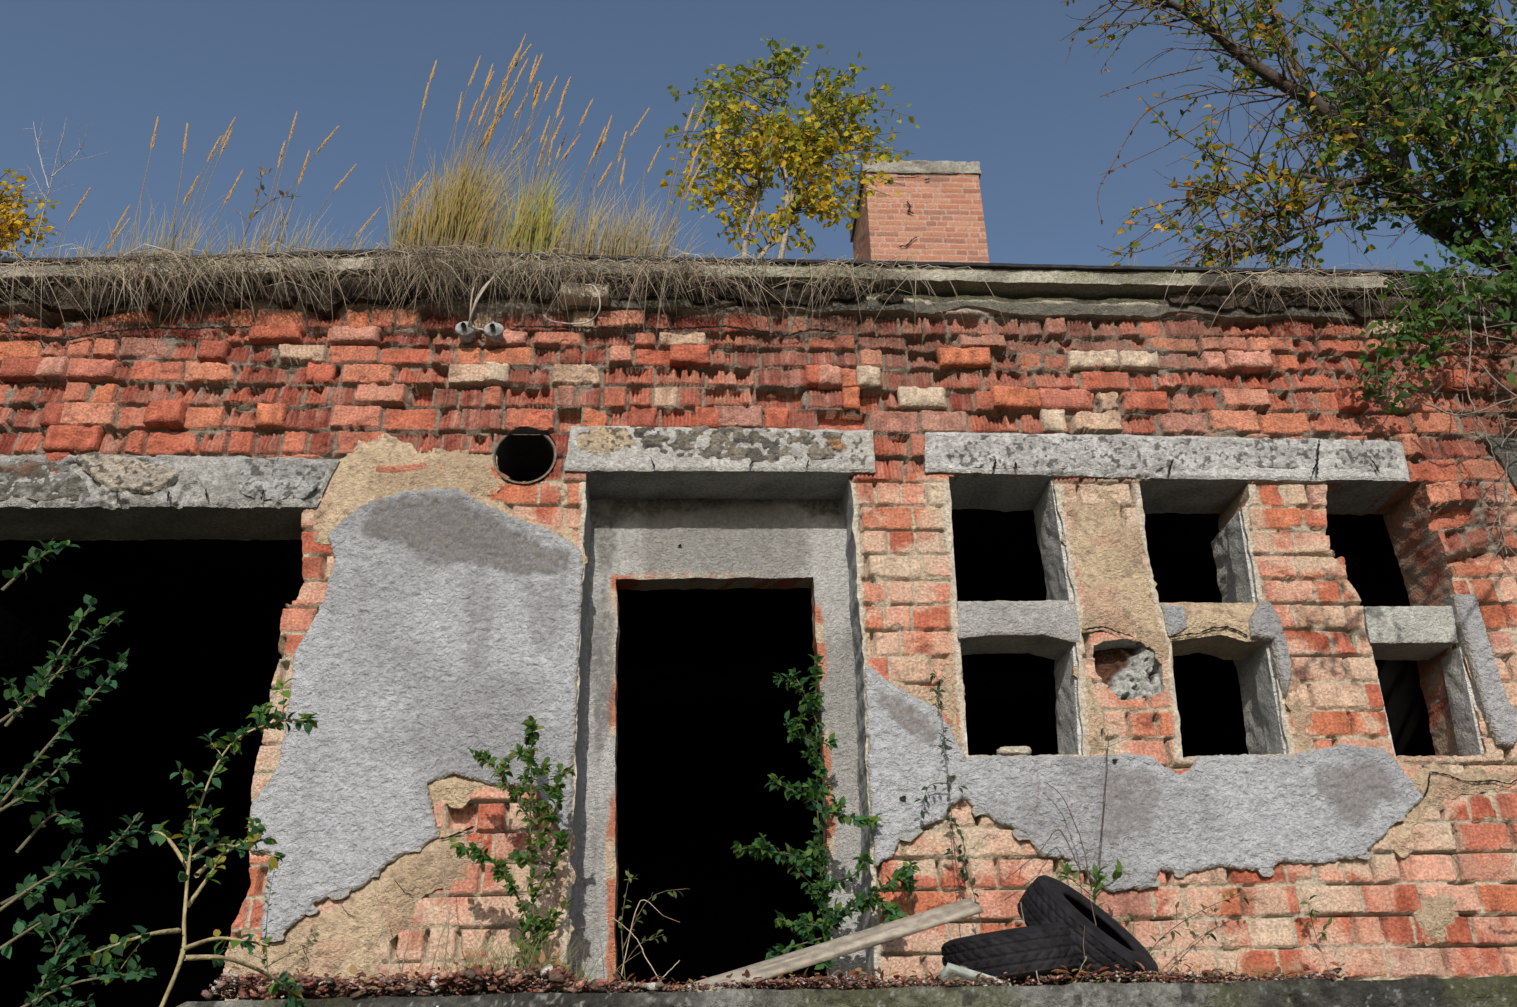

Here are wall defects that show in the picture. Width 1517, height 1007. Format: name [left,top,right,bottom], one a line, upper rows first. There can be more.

spalling [0,356,119,384]
spalling [255,403,288,429]
spalling [248,323,306,346]
spalling [483,329,528,387]
spalling [577,406,874,470]
spalling [806,364,881,411]
spalling [897,386,947,411]
spalling [935,347,1317,470]
spalling [1334,448,1399,472]
flaking render [224,433,588,1001]
flaking render [863,489,1517,893]
flaking render [1410,891,1458,947]